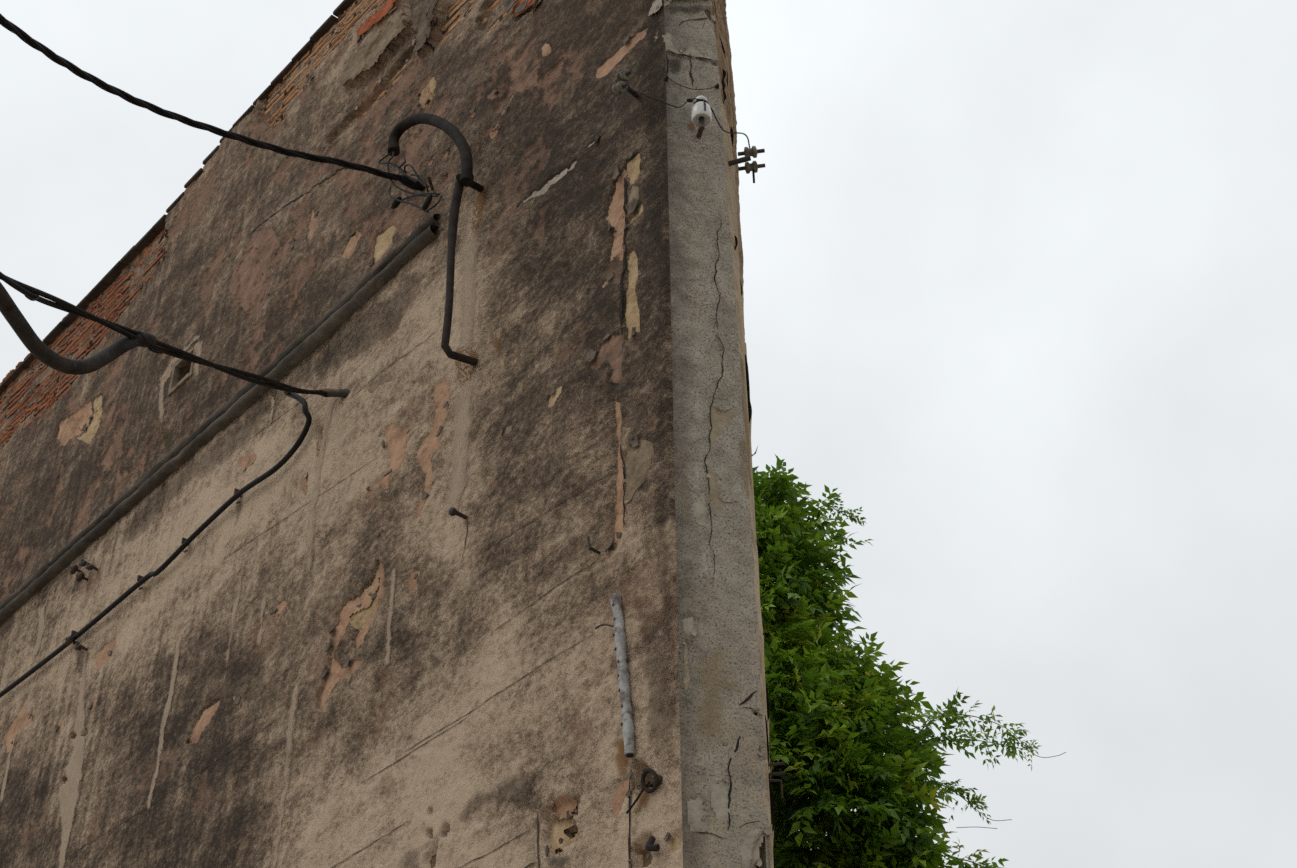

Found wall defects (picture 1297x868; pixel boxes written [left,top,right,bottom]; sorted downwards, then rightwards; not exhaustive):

flaking render [261,0,397,128]
flaking render [596,0,716,78]
flaking render [0,228,167,446]
leakage [448,206,479,509]
flaking render [587,151,643,383]
flaking render [604,401,654,552]
crack [697,221,756,588]
leakage [0,752,11,800]
leakage [59,651,88,868]
leakage [147,638,181,808]
leakage [273,685,298,868]
flaking render [320,562,385,711]